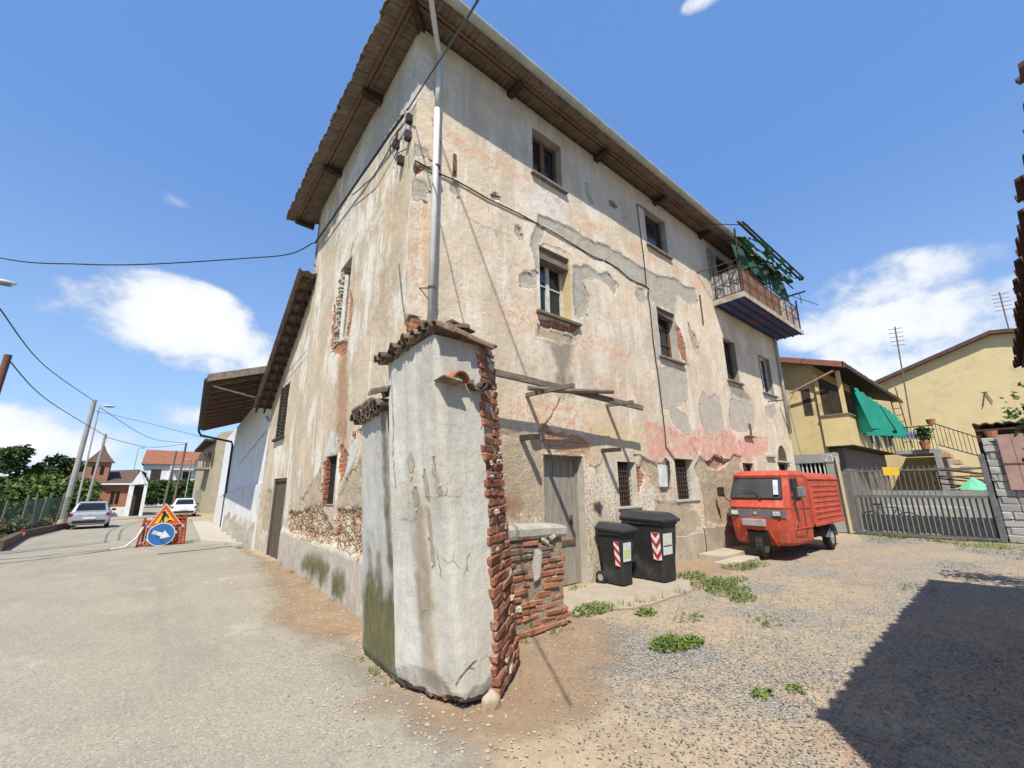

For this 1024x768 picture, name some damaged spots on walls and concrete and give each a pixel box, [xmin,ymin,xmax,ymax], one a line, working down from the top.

flaking render [330,290,353,358]
flaking render [515,214,699,364]
flaking render [287,426,363,563]